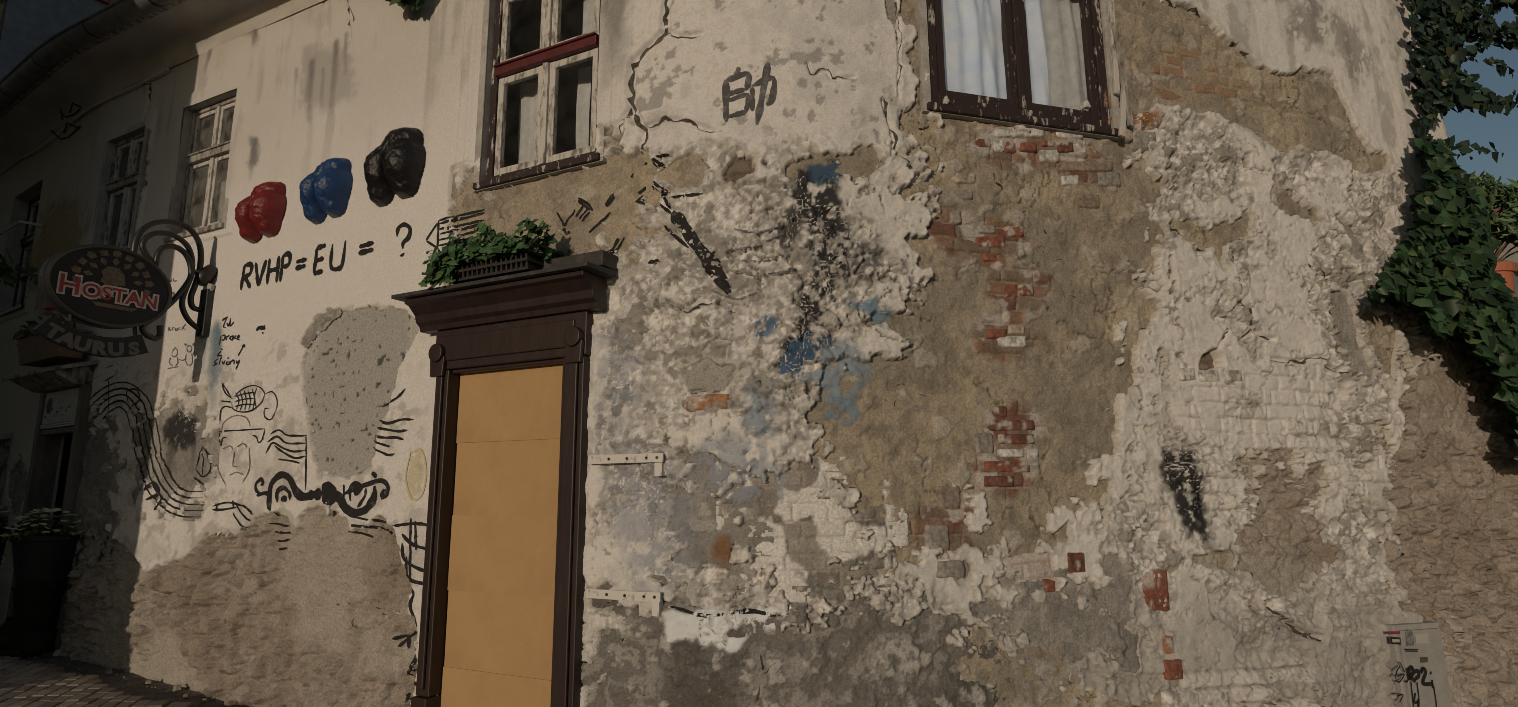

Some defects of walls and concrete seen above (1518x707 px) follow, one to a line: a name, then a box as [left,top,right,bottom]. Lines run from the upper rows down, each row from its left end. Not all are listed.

crack [619,0,714,154]
crack [806,62,847,79]
crack [883,0,912,168]
spalling [451,114,708,268]
spalling [301,304,418,479]
spalling [581,0,1396,707]
spalling [59,387,418,707]